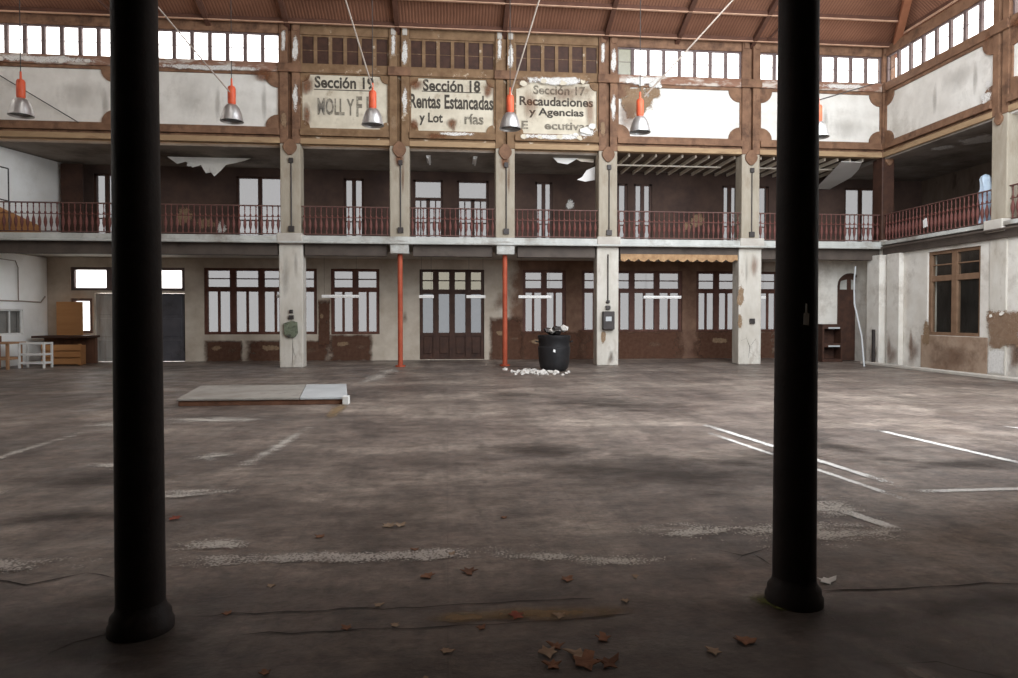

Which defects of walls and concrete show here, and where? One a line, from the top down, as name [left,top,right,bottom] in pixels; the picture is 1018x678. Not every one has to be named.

peeling [601,43,616,72]
peeling [520,76,662,140]
peeling [168,157,251,176]
spalling [985,309,1018,375]